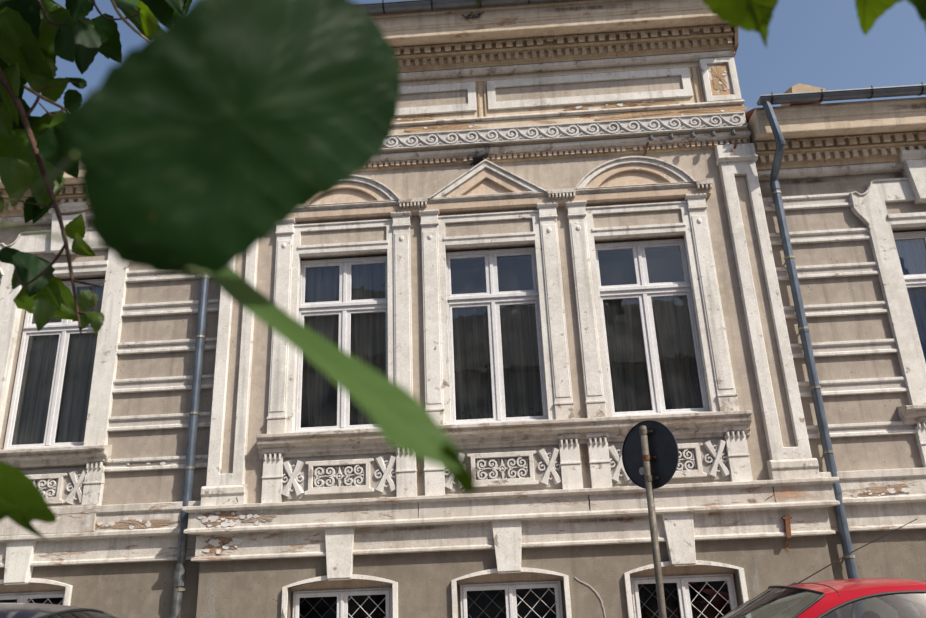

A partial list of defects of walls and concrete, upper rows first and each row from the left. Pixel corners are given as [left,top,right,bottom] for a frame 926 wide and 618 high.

flaking render [711,66,727,91]
peeling [850,483,911,497]
peeling [95,518,180,529]
flaking render [197,511,276,554]